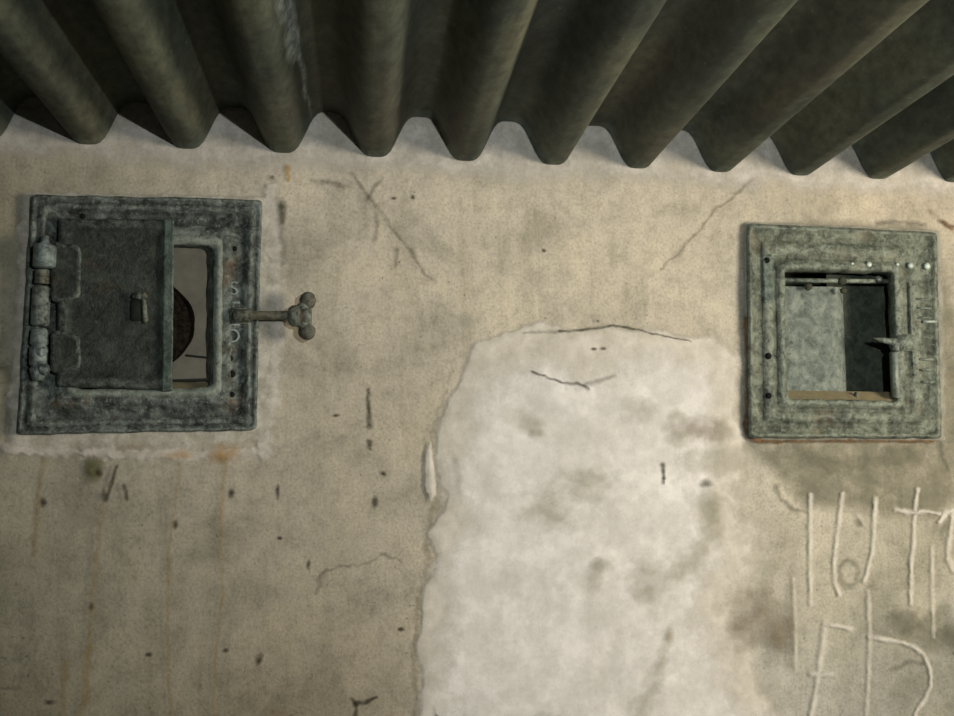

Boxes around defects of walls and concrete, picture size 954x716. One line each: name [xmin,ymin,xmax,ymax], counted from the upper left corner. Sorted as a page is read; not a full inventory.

leakage [763,294,954,510]
flaking render [417,321,778,716]
crack [352,697,378,716]